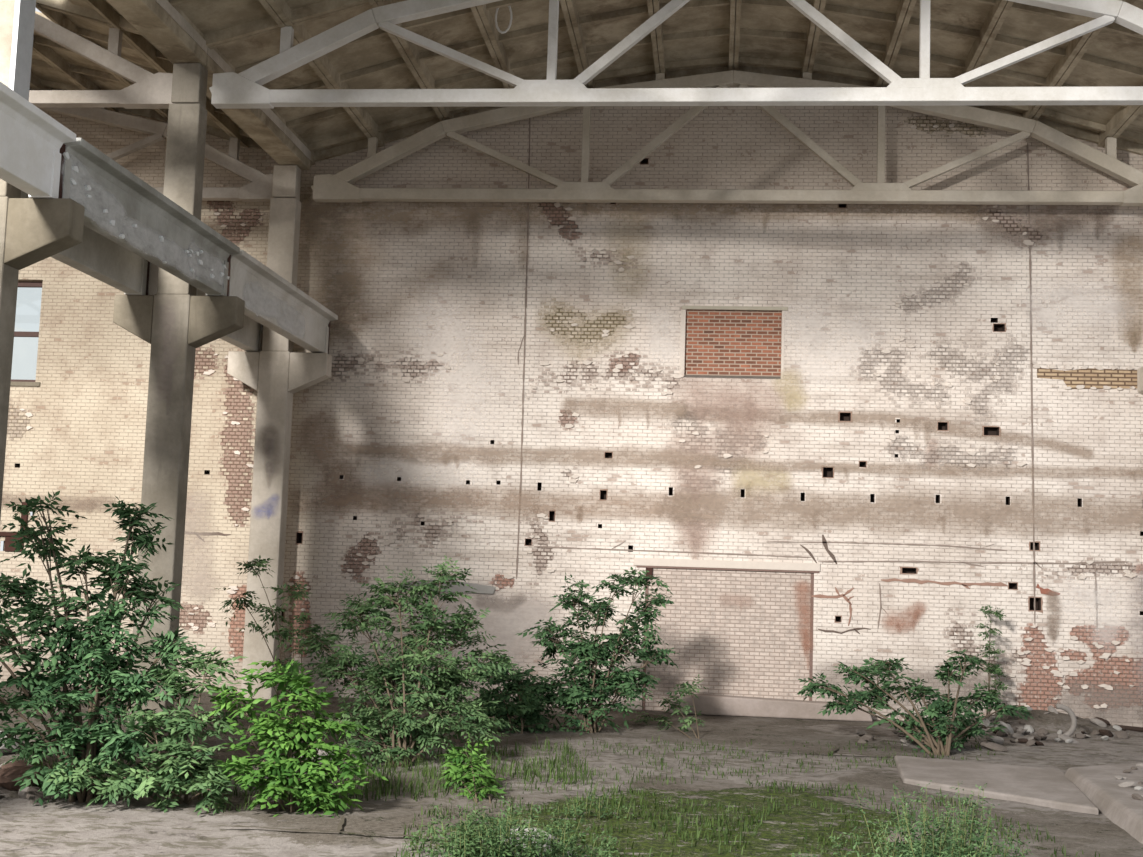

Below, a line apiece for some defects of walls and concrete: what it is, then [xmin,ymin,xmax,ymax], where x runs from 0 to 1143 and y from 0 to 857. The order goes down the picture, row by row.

spalling [194,346,255,527]
leakage [295,377,1143,529]
spalling [1033,364,1137,390]
spalling [1038,557,1142,579]
spalling [937,582,1143,711]